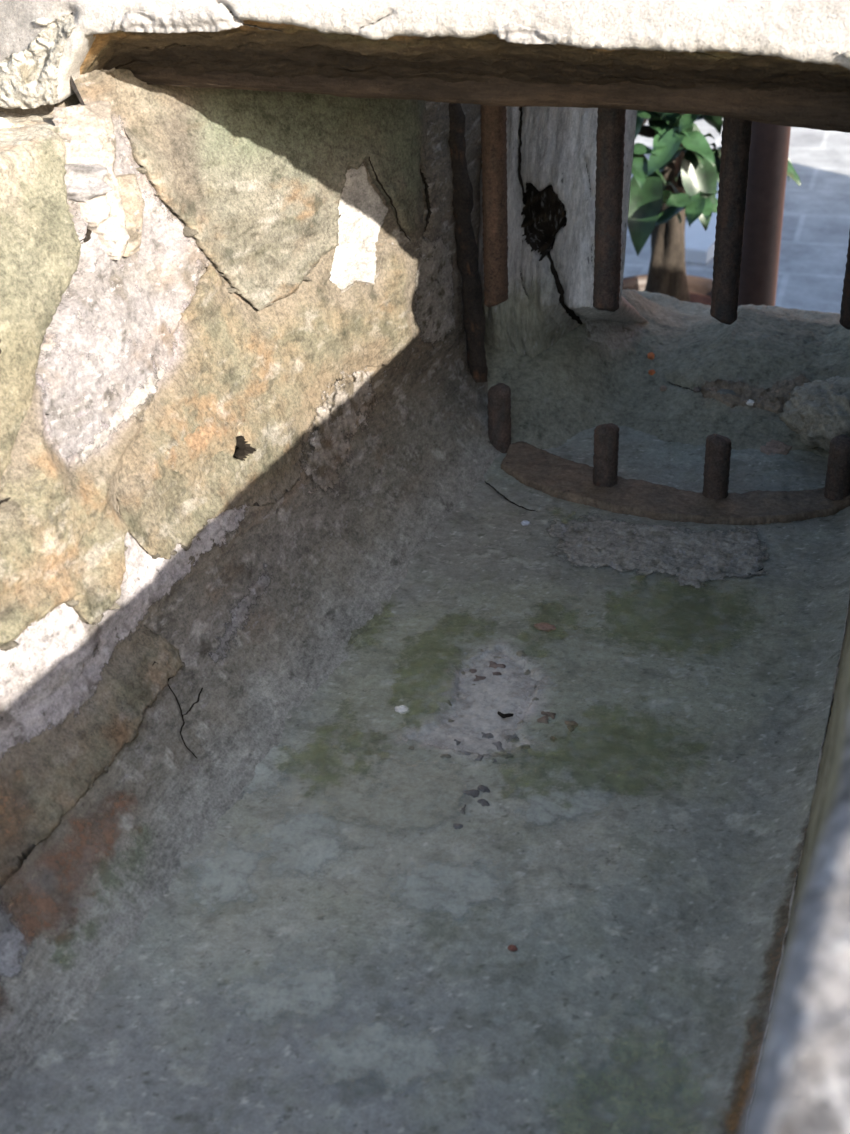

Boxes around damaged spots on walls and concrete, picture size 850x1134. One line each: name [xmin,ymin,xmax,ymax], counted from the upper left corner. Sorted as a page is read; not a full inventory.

crack [518,107,527,205]
crack [547,244,583,325]
peeling [0,3,850,889]
crack [151,662,203,758]
peeling [0,902,31,977]
corrosion [721,821,808,1134]